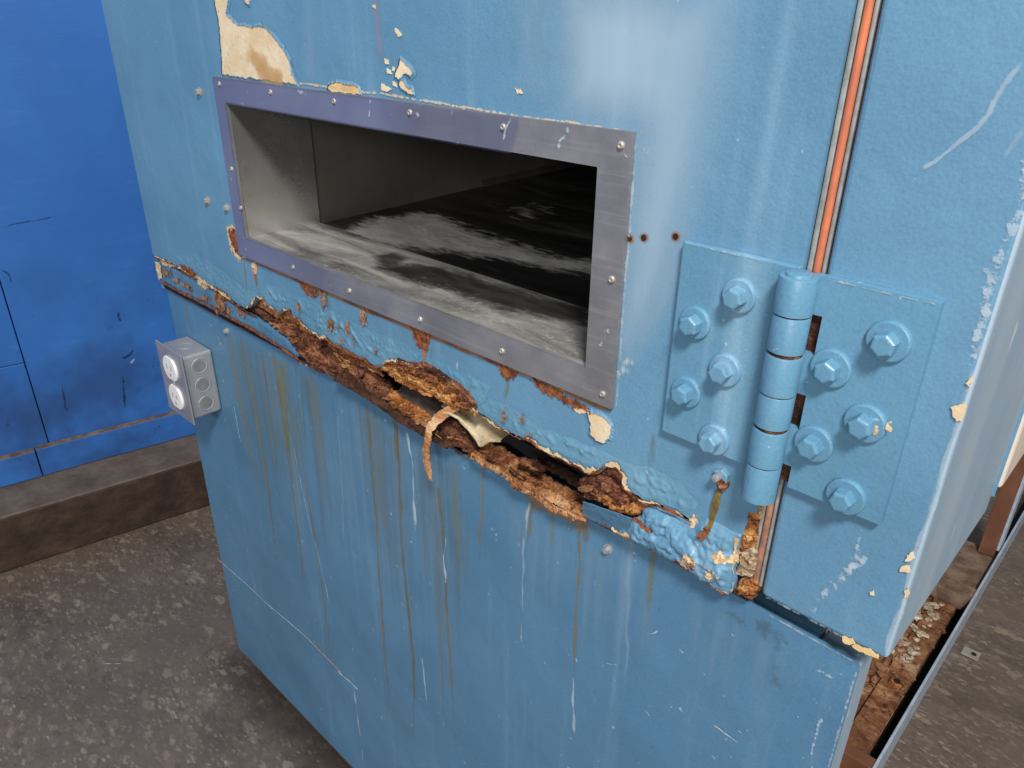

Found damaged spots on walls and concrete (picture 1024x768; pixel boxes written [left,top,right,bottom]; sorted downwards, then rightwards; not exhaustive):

peeling [214,0,300,87]
peeling [326,78,362,95]
peeling [381,55,417,98]
rust [153,225,722,630]
peeling [574,407,615,446]
rust [703,505,764,600]
peeling [900,551,915,573]